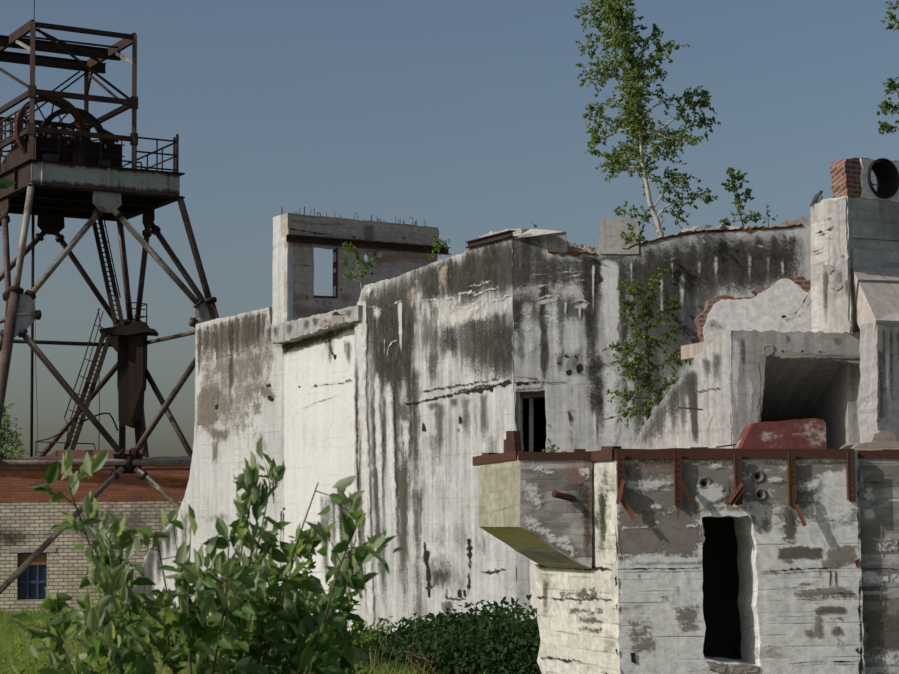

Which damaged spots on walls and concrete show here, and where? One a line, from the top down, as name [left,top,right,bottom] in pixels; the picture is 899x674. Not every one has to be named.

leakage [197,313,291,460]
crack [405,362,617,409]
leakage [321,235,797,589]
crack [233,474,296,567]
leakage [365,550,385,622]